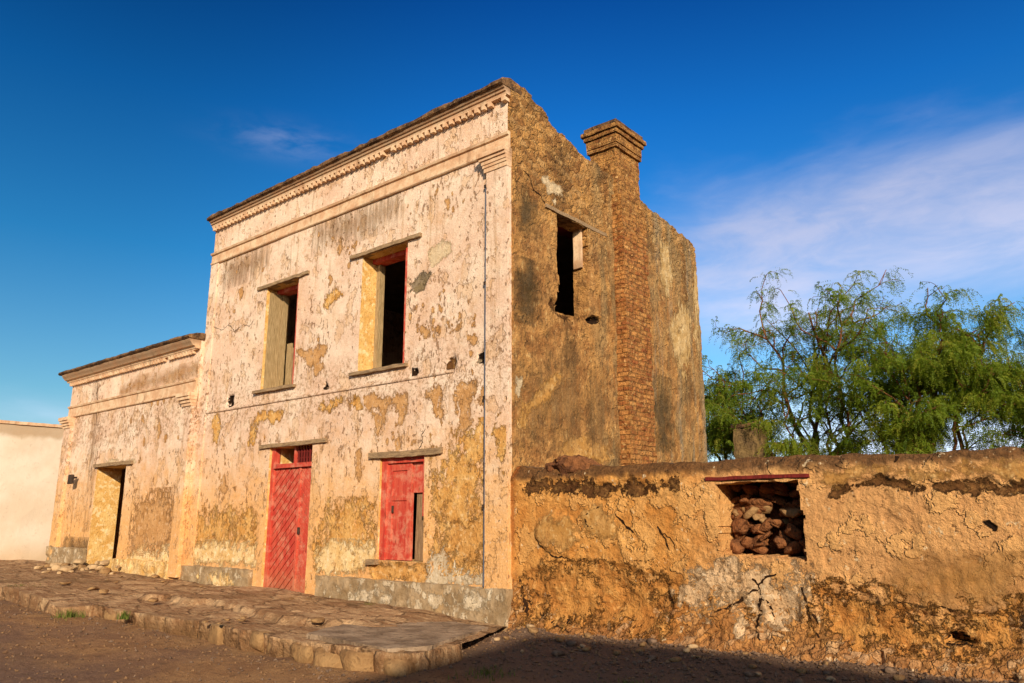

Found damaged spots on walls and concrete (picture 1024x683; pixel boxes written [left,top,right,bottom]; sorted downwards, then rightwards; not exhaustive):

peeling [106,399,179,466]
peeling [247,409,284,447]
peeling [295,228,506,612]
peeling [127,476,175,557]
peeling [195,462,259,547]
crack [584,506,675,549]
crack [715,574,776,641]
spalling [515,556,1024,665]